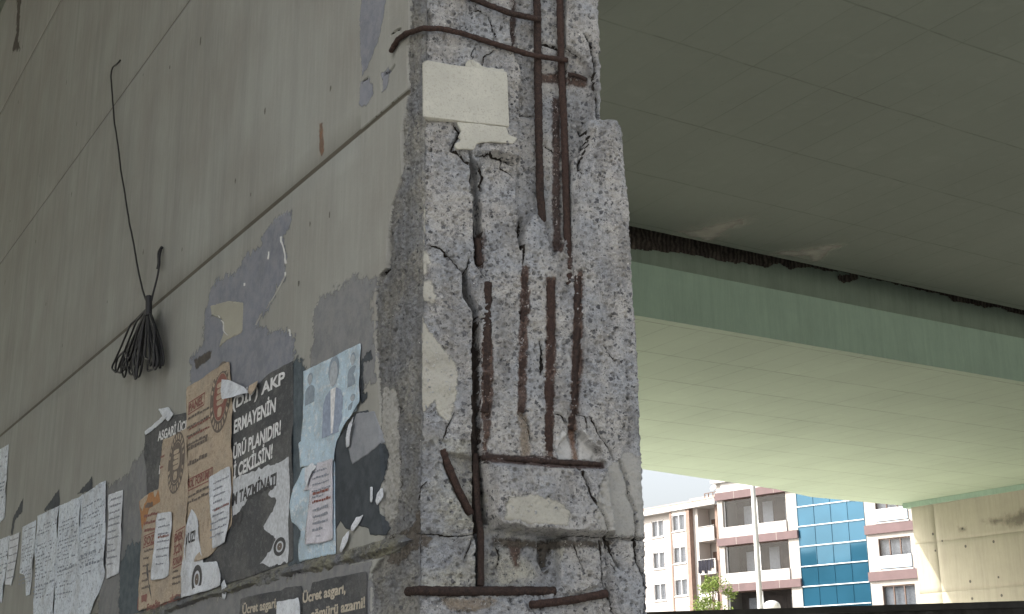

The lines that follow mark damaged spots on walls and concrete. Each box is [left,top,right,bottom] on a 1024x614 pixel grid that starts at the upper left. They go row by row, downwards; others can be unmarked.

corrosion [542,70,587,88]
crack [542,37,597,174]
crack [450,126,512,192]
spalling [135,0,644,614]
crack [430,245,484,276]
crack [516,223,525,260]
corrosion [477,98,604,469]
spalling [629,226,1024,315]
crack [555,414,608,448]
crack [398,407,499,568]
corrosion [509,540,520,567]
crack [560,469,646,613]